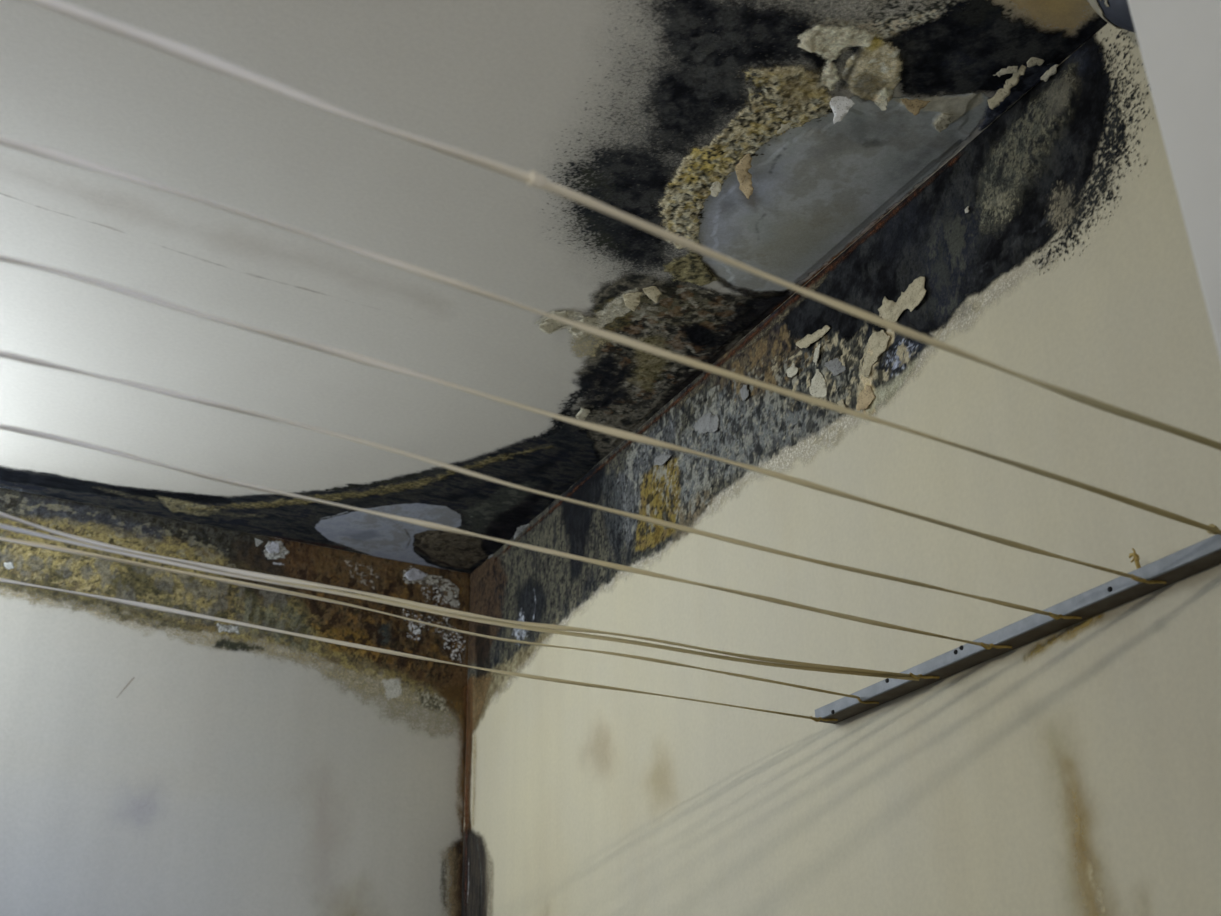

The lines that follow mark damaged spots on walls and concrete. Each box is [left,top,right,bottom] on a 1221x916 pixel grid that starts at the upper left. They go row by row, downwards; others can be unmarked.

peeling [314,503,462,569]
damp [0,0,1153,737]
corrosion [494,156,959,562]
peeling [468,0,1059,730]
corrosion [440,675,493,916]